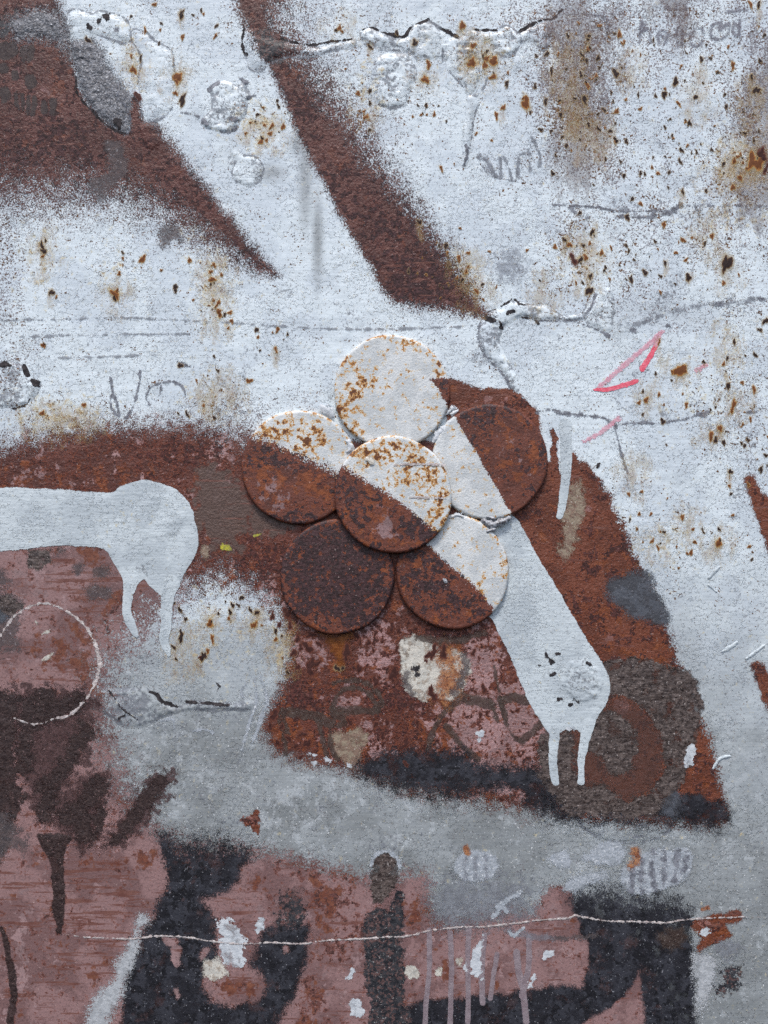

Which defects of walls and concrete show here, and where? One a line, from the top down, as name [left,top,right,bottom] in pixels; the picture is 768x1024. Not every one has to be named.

rust [0,0,283,286]
rust [230,0,497,320]
crack [241,8,564,167]
rust [521,21,642,157]
rust [639,118,714,195]
rust [553,227,621,295]
rust [625,233,714,295]
rust [709,338,763,448]
rust [728,436,768,553]
rust [0,378,731,835]
peeling [398,634,472,709]
rust [690,906,743,953]